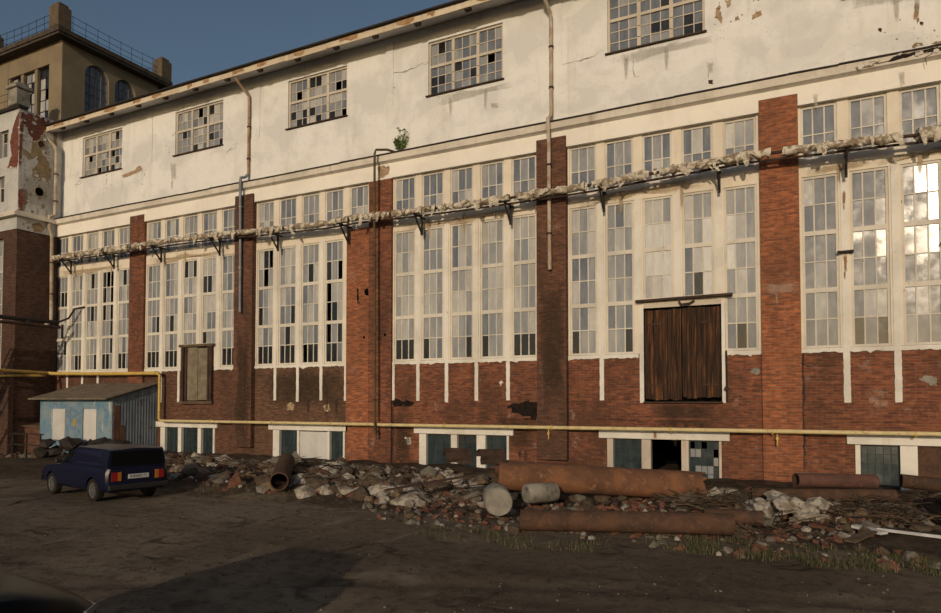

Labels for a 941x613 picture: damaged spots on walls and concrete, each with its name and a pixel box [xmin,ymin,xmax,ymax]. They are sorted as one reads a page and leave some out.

peeling [714,0,762,39]
flaking render [855,15,941,70]
flaking render [7,110,58,229]